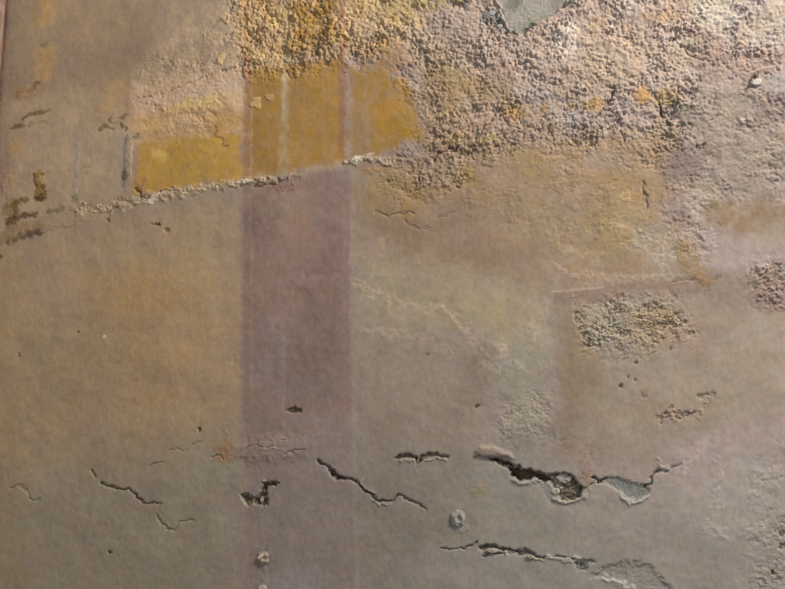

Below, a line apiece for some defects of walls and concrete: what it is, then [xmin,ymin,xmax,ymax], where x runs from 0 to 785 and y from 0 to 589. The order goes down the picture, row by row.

flaking render [342,0,785,196]
damp [0,141,92,261]
flaking render [69,172,303,223]
flaking render [745,261,785,313]
flaking render [571,287,696,365]
crack [90,469,194,532]
flaking render [238,479,280,508]
crack [317,459,426,509]
crack [394,451,449,466]
flaking render [474,447,651,507]
crack [440,540,576,564]